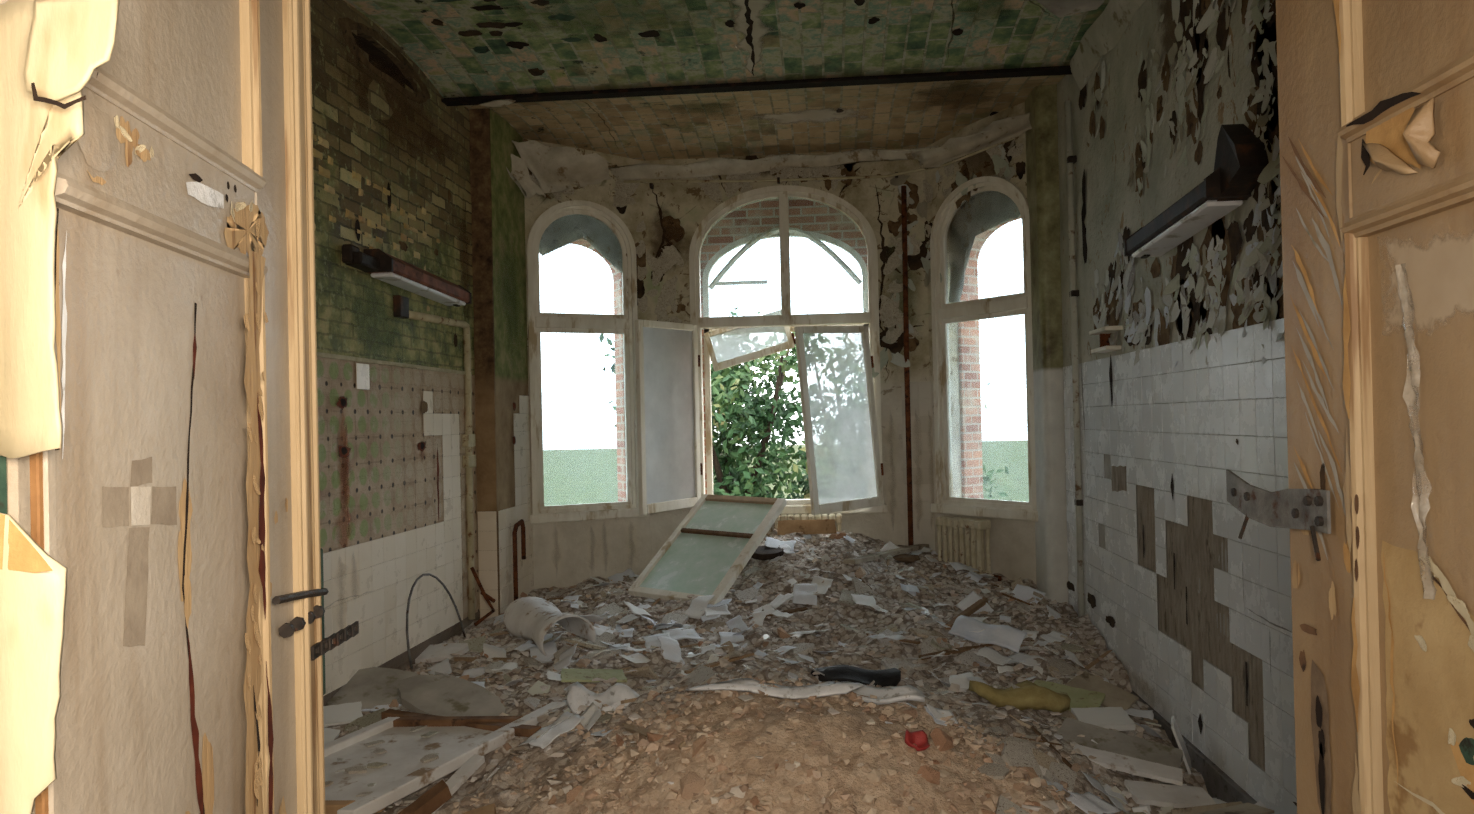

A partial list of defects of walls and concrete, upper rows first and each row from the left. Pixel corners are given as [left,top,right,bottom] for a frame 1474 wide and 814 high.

crack [734,0,769,76]
peeling [872,140,1026,378]
peeling [1078,55,1111,140]
peeling [1091,0,1284,367]
rust [338,445,351,458]
peeling [1111,465,1265,771]
spalling [1299,274,1361,814]
peeling [1381,540,1474,814]